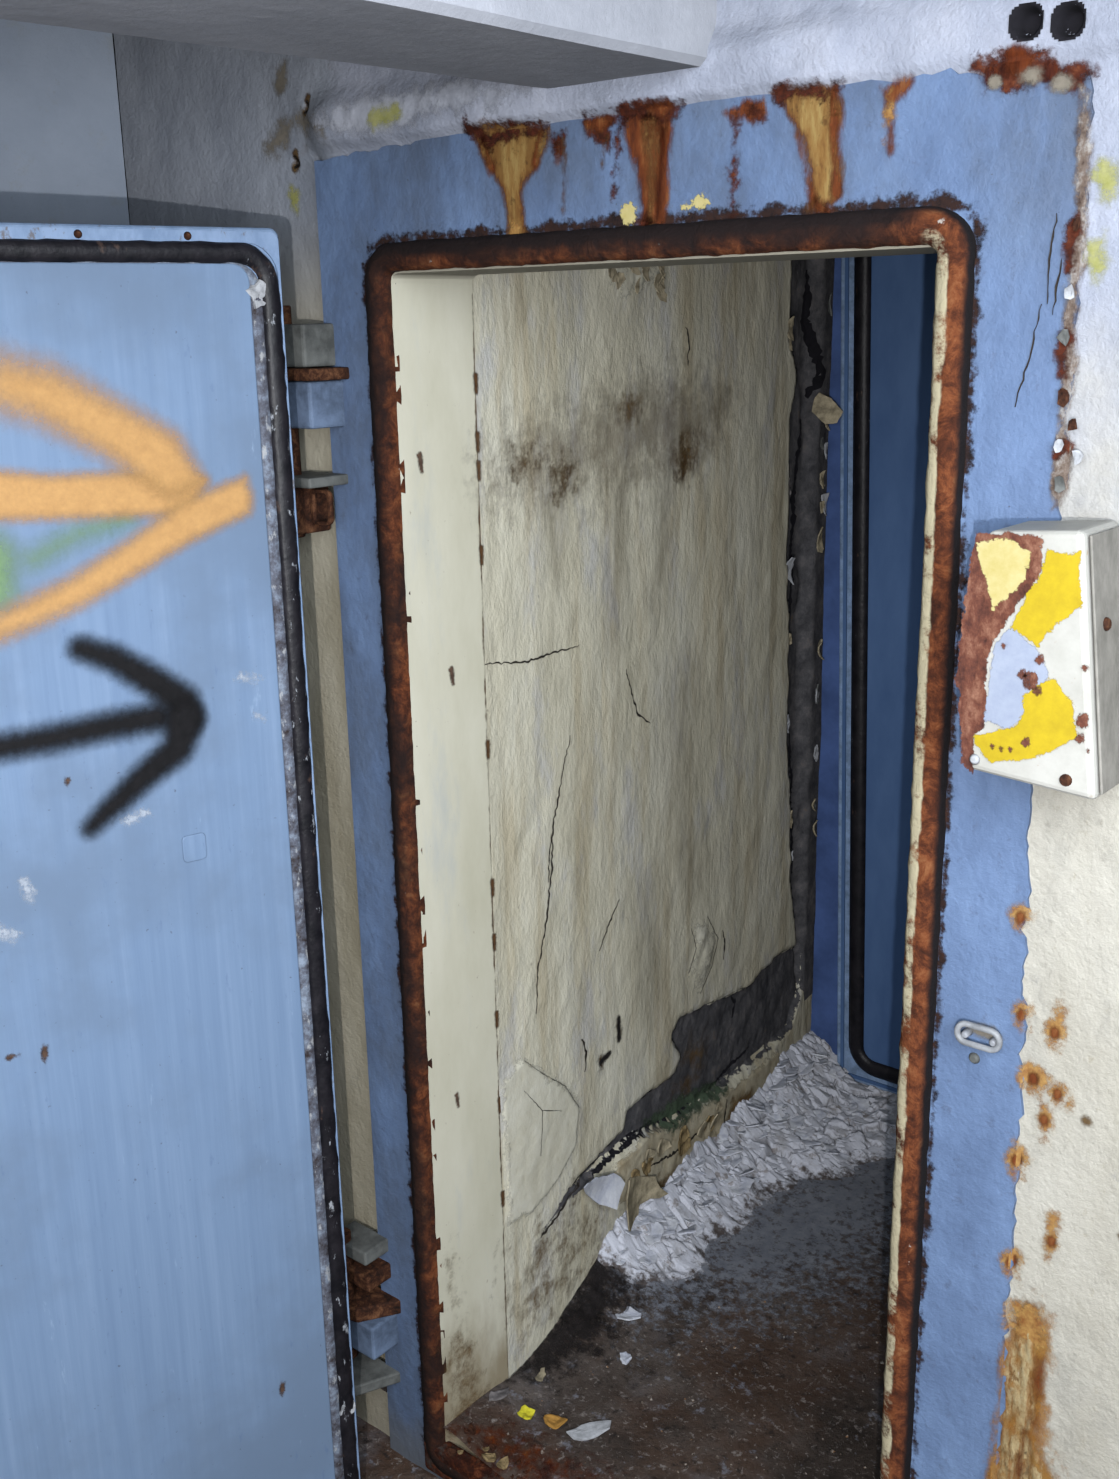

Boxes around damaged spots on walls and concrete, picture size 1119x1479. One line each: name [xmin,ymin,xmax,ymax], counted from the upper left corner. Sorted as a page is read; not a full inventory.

water stain [511,446,574,502]
water stain [673,431,698,480]
spalling [501,258,843,1238]
rust [362,77,987,1450]
rust [1009,905,1031,930]
rust [1013,1003,1033,1028]
rust [1044,1006,1068,1054]
rust [1016,1062,1074,1139]
rust [1005,1141,1030,1180]
rust [1044,1212,1060,1258]
rust [1000,1248,1024,1278]
rust [987,1299,1053,1479]